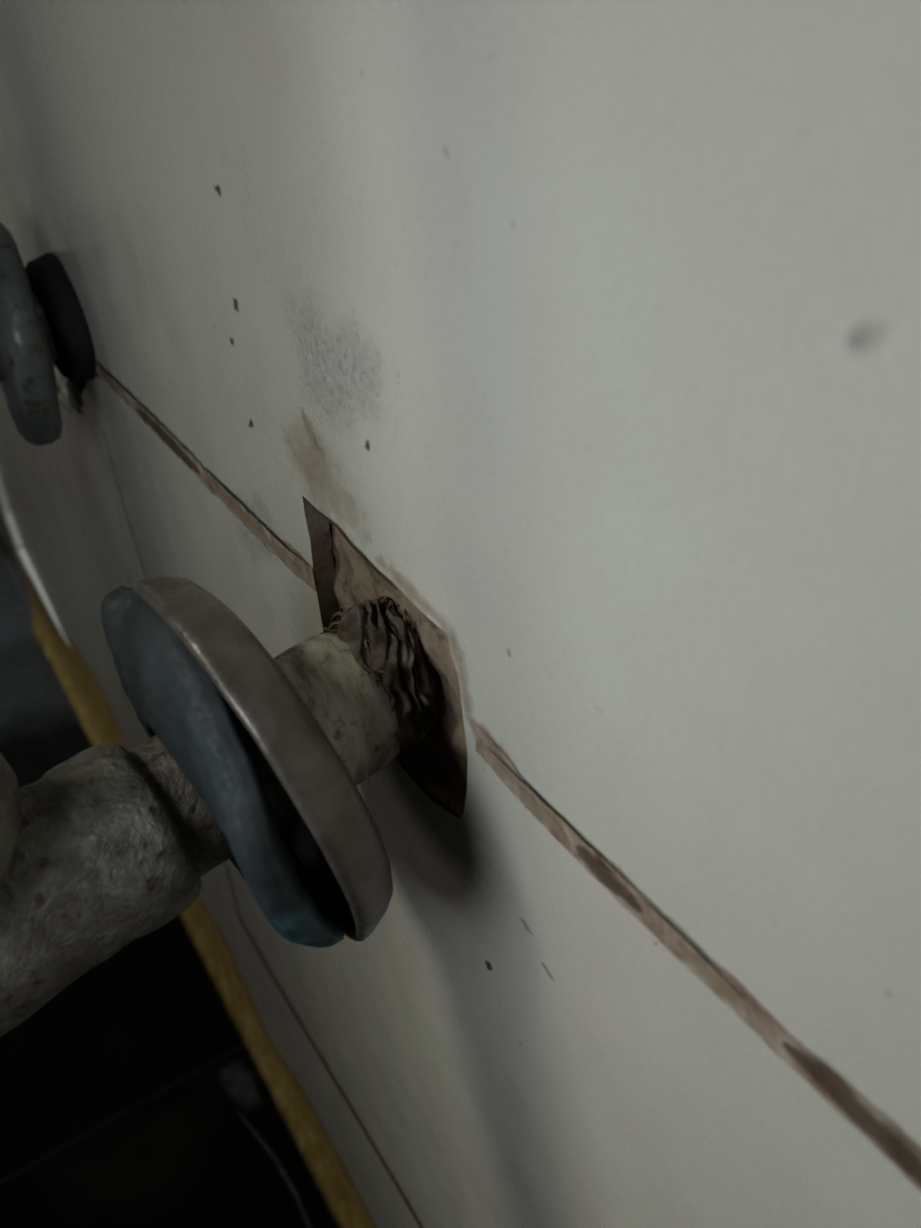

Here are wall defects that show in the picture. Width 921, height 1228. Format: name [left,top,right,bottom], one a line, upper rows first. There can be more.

spalling [303,496,468,815]